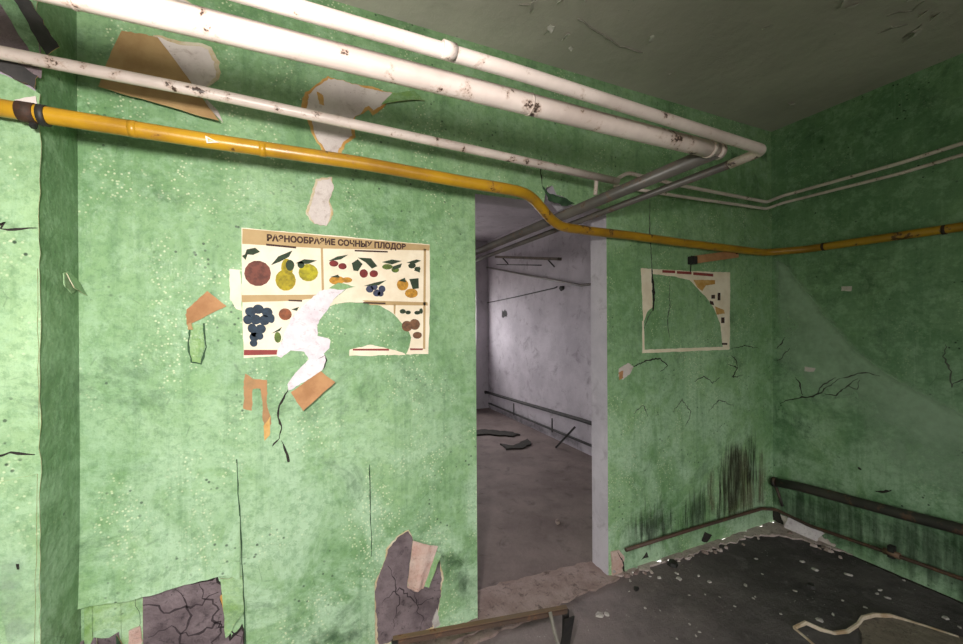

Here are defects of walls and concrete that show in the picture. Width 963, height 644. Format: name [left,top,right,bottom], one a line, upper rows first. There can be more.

crack [942,344,963,388]
crack [272,390,290,462]
spalling [80,576,245,644]
spalling [375,530,444,644]